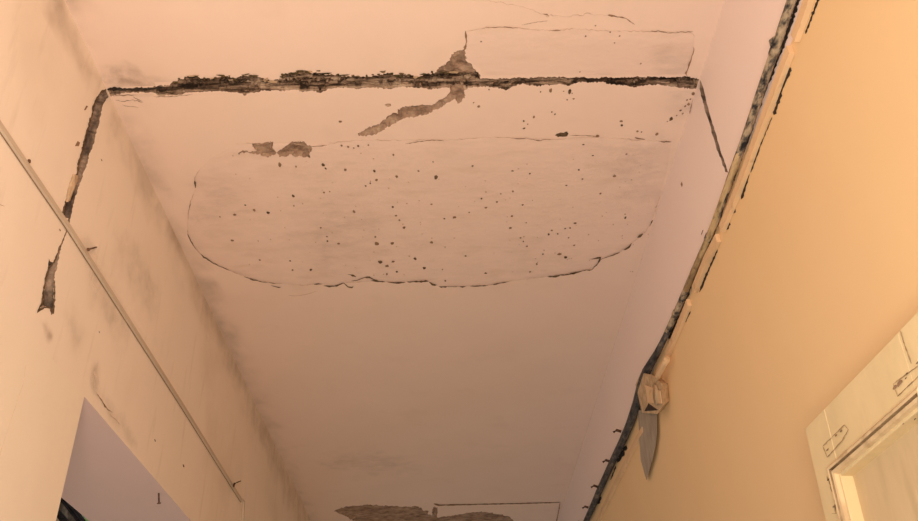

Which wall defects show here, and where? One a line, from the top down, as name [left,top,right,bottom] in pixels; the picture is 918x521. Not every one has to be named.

spalling [436,46,480,76]
spalling [340,83,480,154]
spalling [232,141,312,167]
crack [37,0,728,315]
spalling [335,504,513,521]